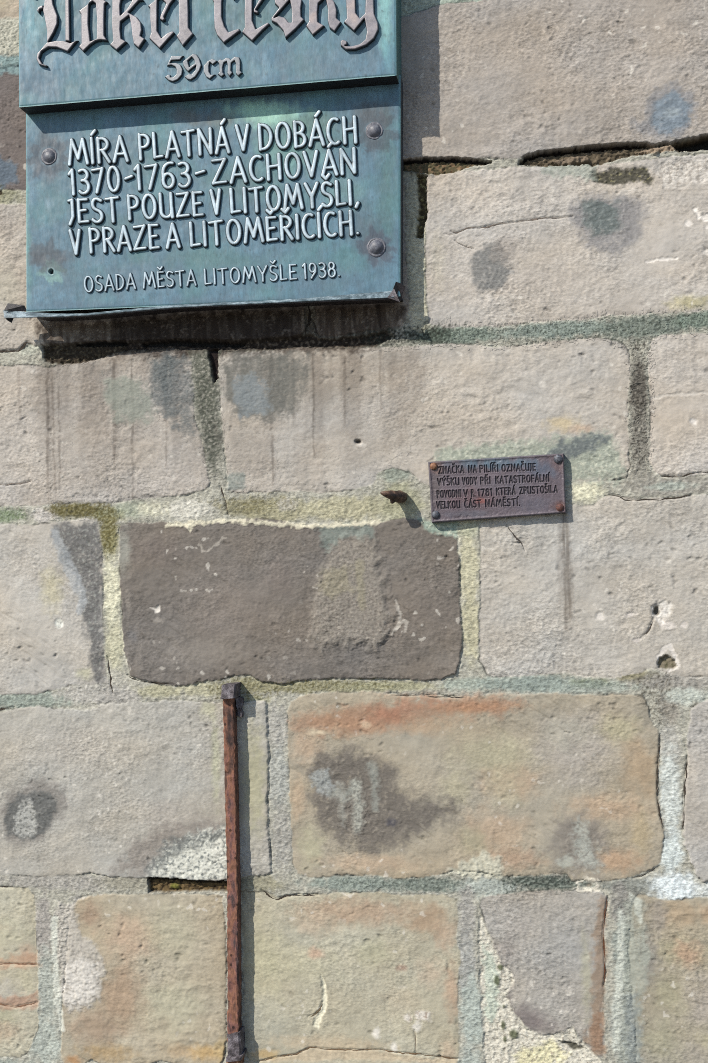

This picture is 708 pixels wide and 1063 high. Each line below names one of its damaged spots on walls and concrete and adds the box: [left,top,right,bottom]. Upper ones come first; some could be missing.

leakage [467,224,529,293]
crack [403,133,708,248]
leakage [540,164,651,259]
leakage [47,519,112,690]
leakage [0,773,74,851]
leakage [293,737,471,862]
spalling [476,911,602,1063]